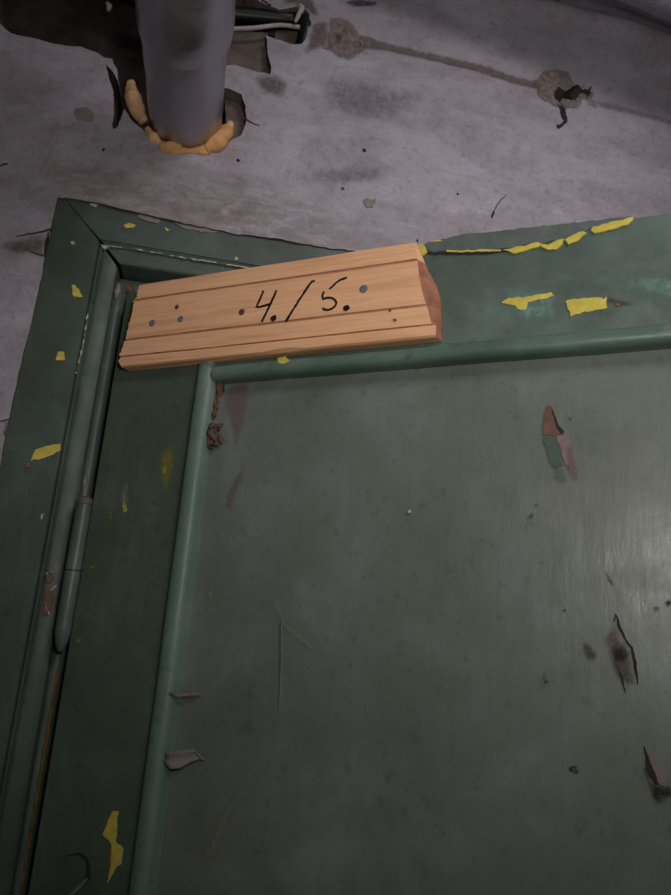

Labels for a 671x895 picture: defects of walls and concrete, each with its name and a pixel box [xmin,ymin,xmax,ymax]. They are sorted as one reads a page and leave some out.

spalling [1,0,150,131]
spalling [226,22,299,74]
spalling [222,99,245,140]
peeling [418,216,633,256]
peeling [502,292,554,320]
peeling [566,296,628,317]
spalling [543,405,576,480]
spalling [608,613,638,692]
peeling [163,749,205,769]
spalling [644,746,671,801]
peeling [103,811,123,883]